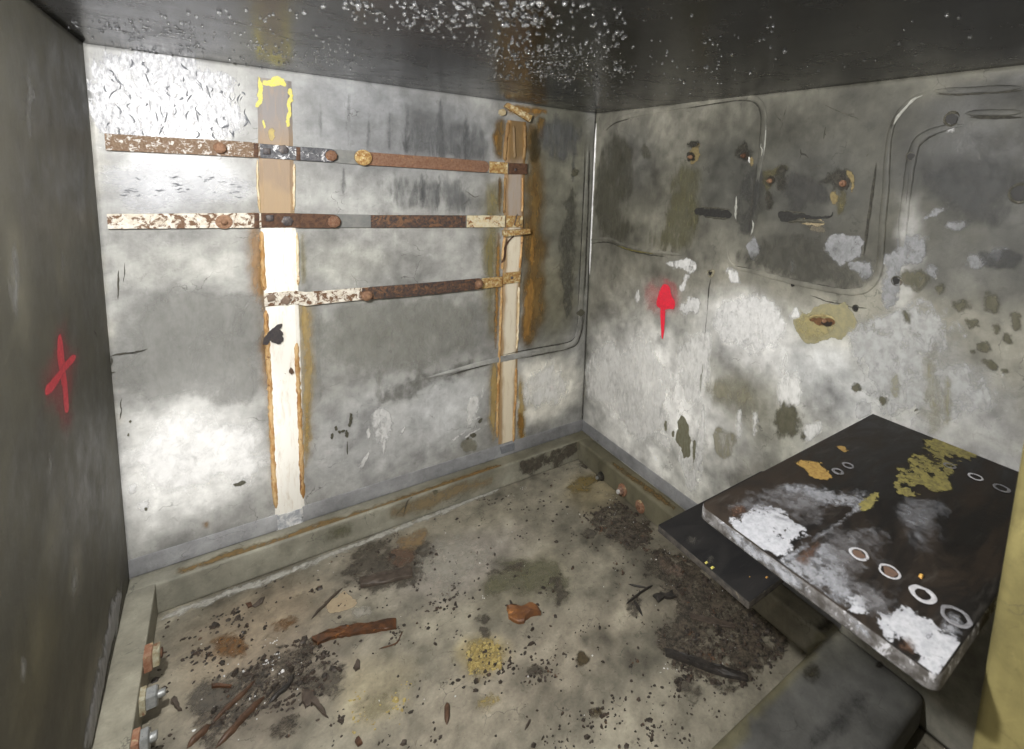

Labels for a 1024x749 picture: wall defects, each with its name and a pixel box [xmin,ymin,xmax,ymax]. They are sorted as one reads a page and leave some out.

corrosion [251,213,265,314]
corrosion [484,179,501,340]
corrosion [493,105,546,344]
corrosion [301,305,314,451]